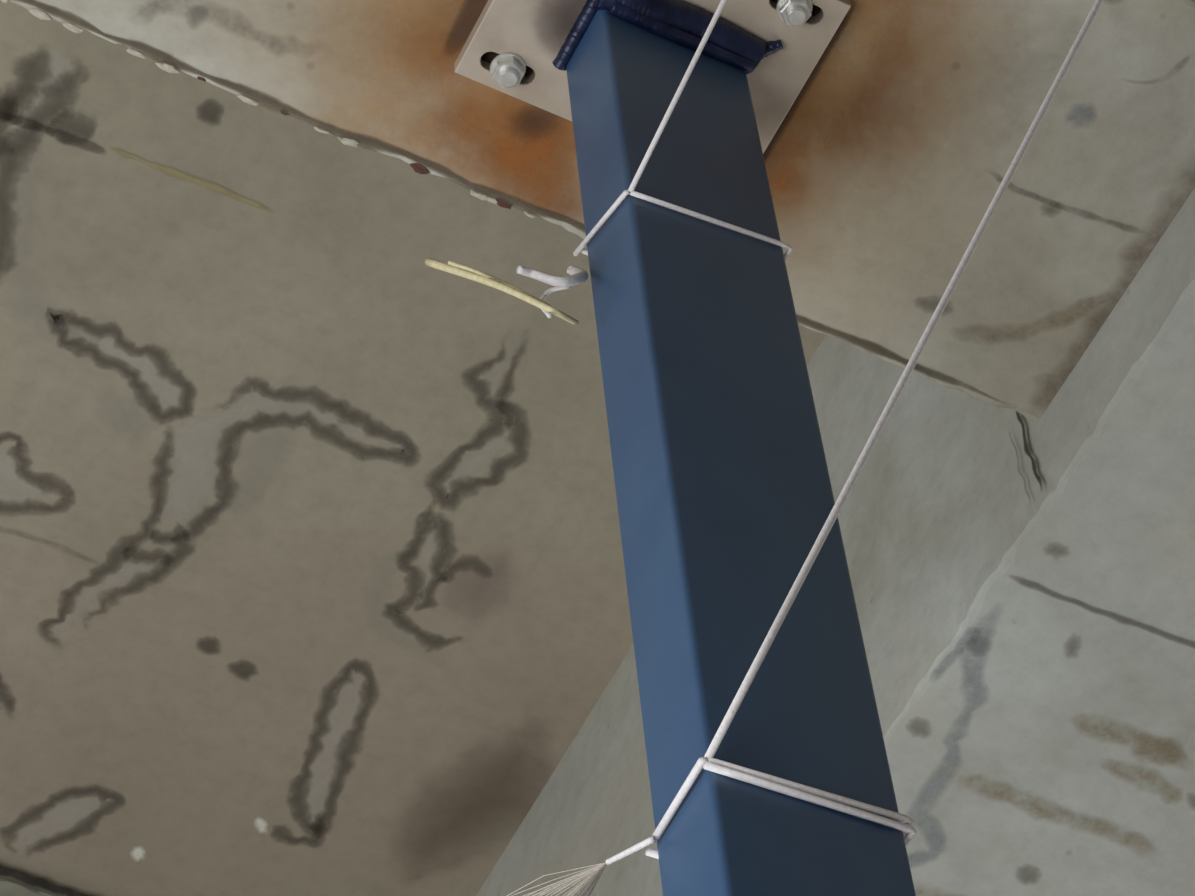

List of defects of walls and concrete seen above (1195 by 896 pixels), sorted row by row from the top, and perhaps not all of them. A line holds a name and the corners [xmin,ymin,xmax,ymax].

damp [0,57,93,268]
rust [377,0,576,209]
rust [763,0,914,193]
crack [1026,583,1195,646]